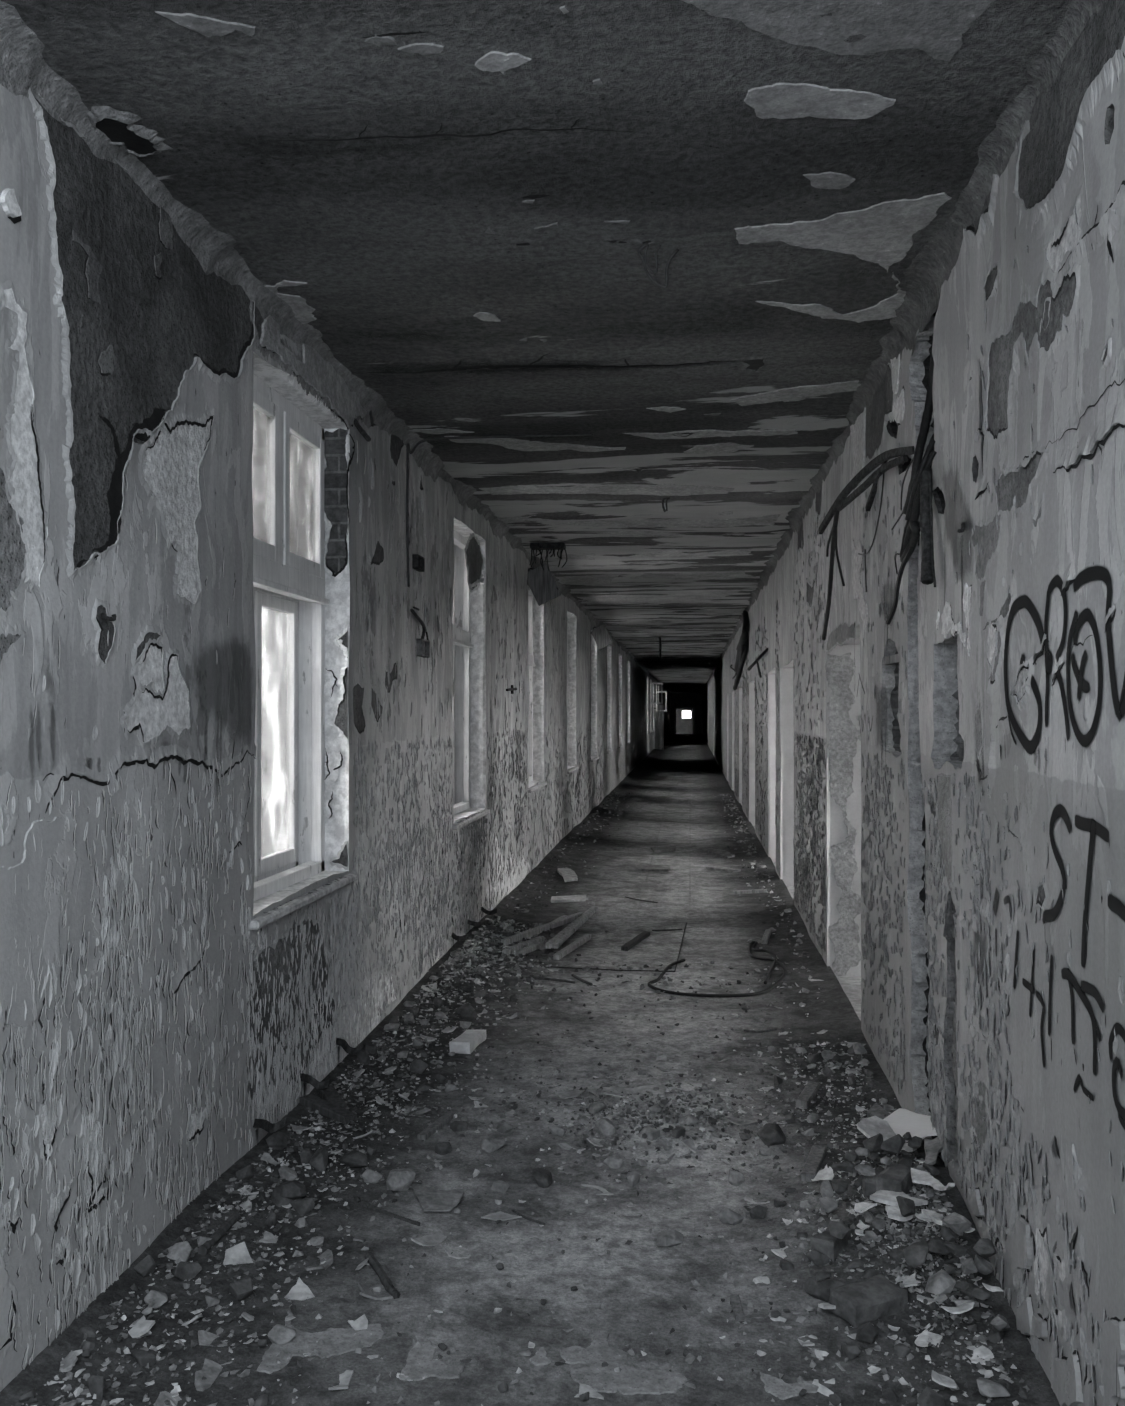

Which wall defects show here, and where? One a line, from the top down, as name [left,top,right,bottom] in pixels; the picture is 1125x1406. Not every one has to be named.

spalling [734,0,1125,1406]
crack [966,361,1125,500]